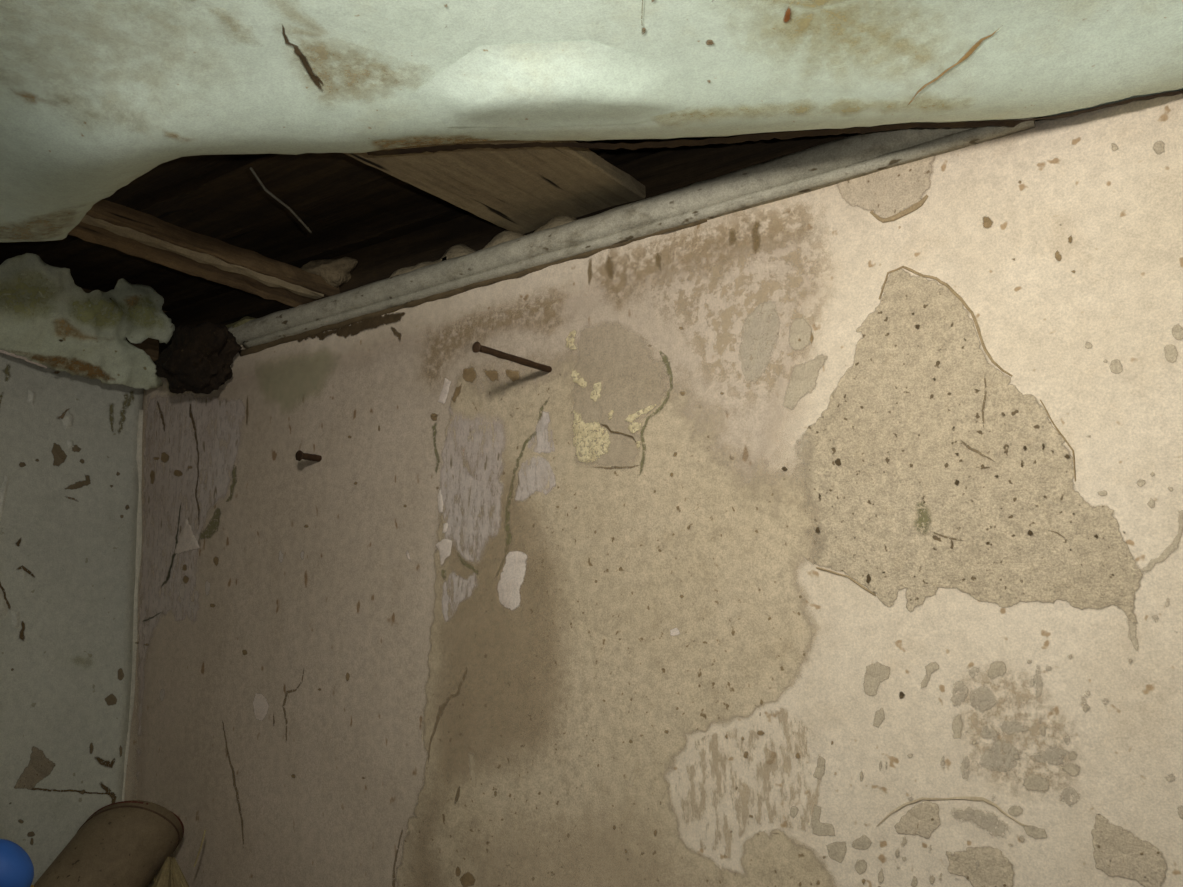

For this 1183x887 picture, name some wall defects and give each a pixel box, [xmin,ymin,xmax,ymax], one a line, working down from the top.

damp [305,45,397,93]
peeling [837,156,935,223]
peeling [0,253,175,390]
spalling [297,312,405,342]
peeling [1164,324,1183,363]
flaking render [396,266,1143,887]
crack [428,668,467,762]
peeling [14,746,55,790]
crack [392,830,403,887]
peeling [1091,814,1167,887]